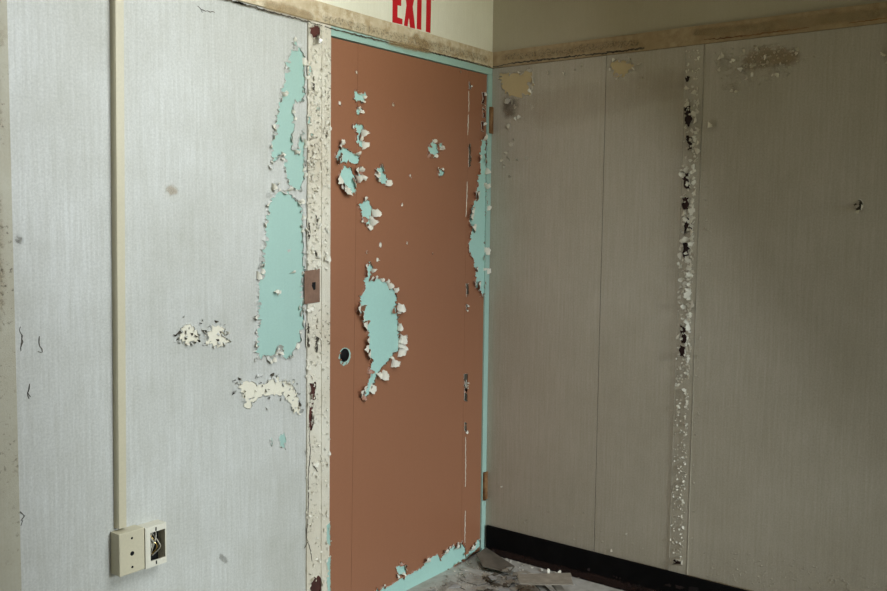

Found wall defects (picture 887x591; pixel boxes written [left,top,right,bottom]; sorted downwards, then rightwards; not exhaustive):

peeling [498,67,535,130]
peeling [467,134,492,297]
peeling [173,316,232,349]
peeling [232,24,393,591]
peeling [356,242,408,402]
peeling [670,50,712,565]
peeling [373,538,481,591]
peeling [491,548,656,591]